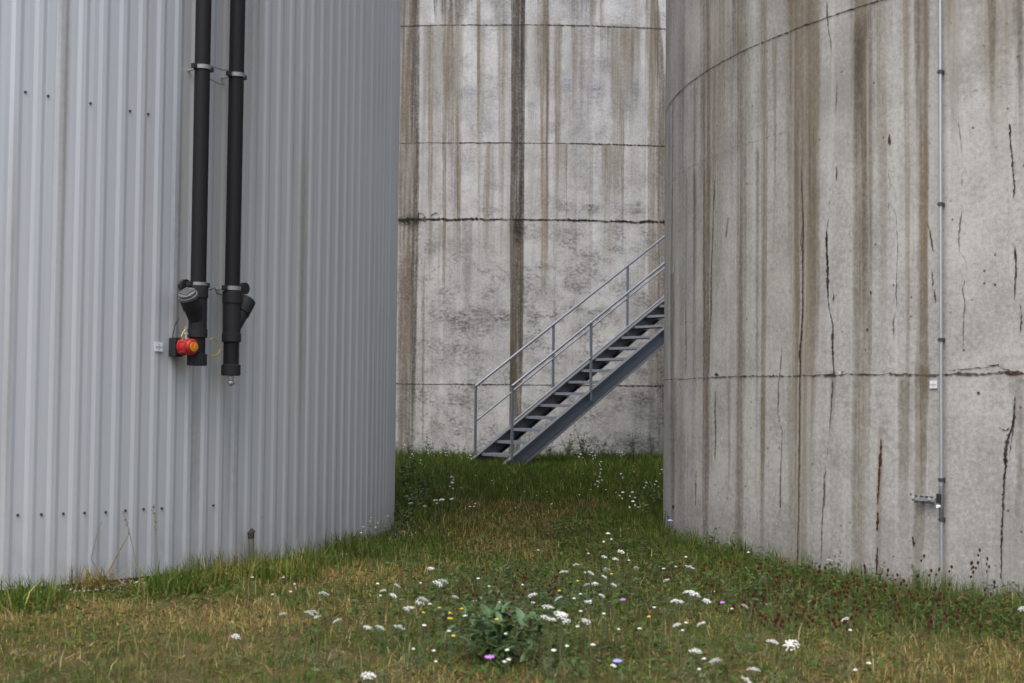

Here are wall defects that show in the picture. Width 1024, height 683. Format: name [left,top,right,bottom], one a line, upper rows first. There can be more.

leakage [399,0,459,447]
leakage [501,0,560,425]
leakage [611,0,665,300]
leakage [728,103,742,459]
leakage [790,38,815,383]
crack [777,166,837,556]
leakage [855,0,871,312]
leakage [917,0,928,396]
crack [958,211,966,341]
crack [1000,398,1016,579]
crack [1008,124,1016,197]
crack [1014,249,1022,331]